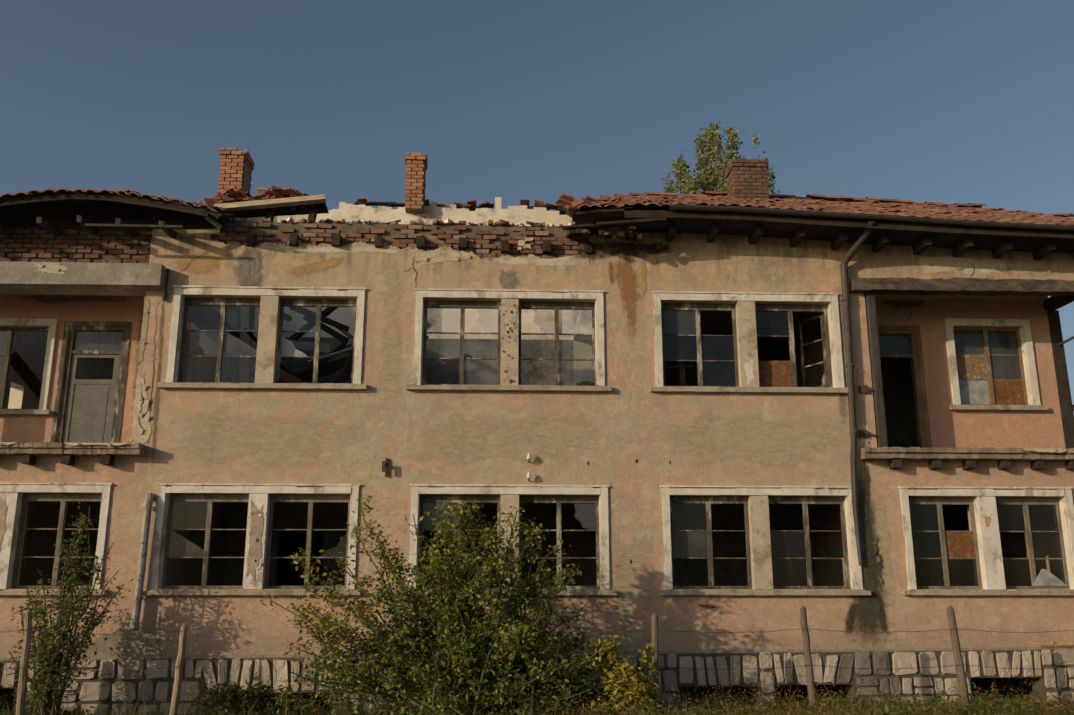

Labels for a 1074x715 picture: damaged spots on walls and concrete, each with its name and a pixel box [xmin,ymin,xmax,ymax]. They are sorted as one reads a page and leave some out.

crack [149,304,158,412]
damp [864,467,893,631]
damp [846,604,855,633]